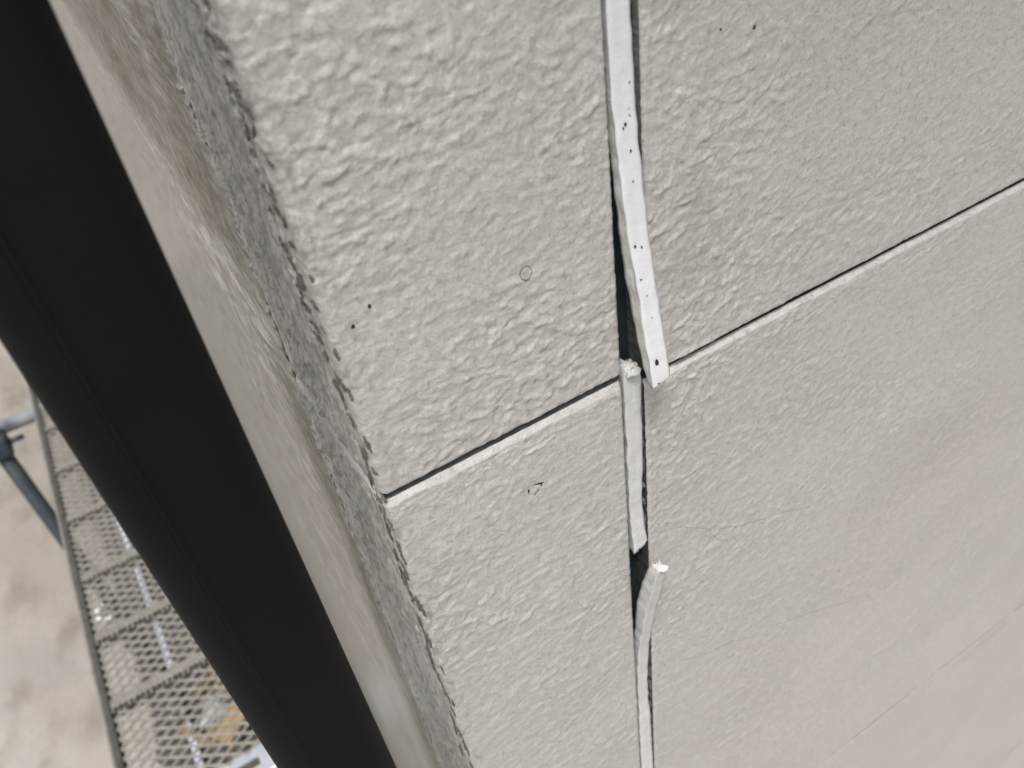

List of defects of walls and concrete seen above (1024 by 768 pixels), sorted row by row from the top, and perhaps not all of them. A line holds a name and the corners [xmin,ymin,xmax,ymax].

peeling [601,0,670,555]
peeling [634,559,669,768]